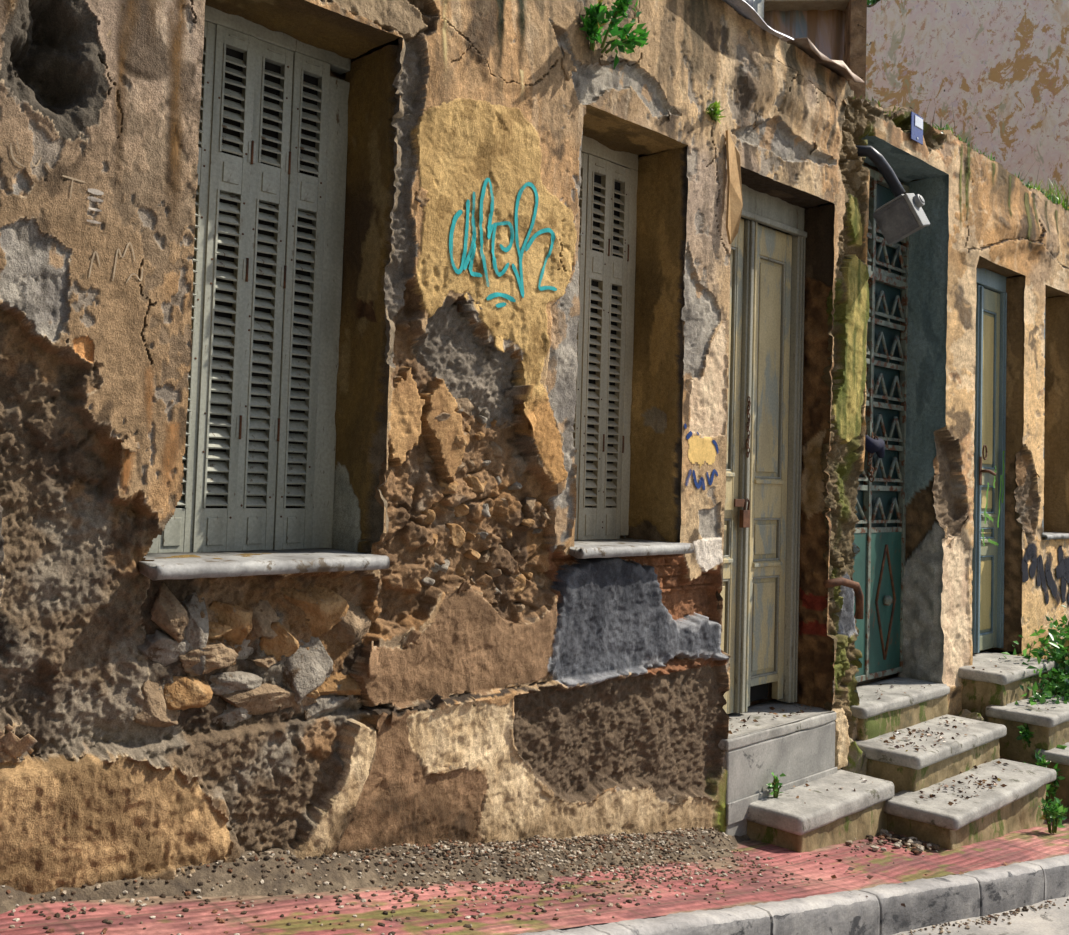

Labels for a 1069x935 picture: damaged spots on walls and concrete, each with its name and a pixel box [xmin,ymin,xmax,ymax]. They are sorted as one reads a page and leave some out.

water stain [497,0,505,45]
crack [138,258,157,364]
flaking render [0,0,582,855]
flaking render [513,554,730,803]
flaking render [726,96,947,769]
peeling [932,425,971,686]
flaking render [1014,443,1041,547]